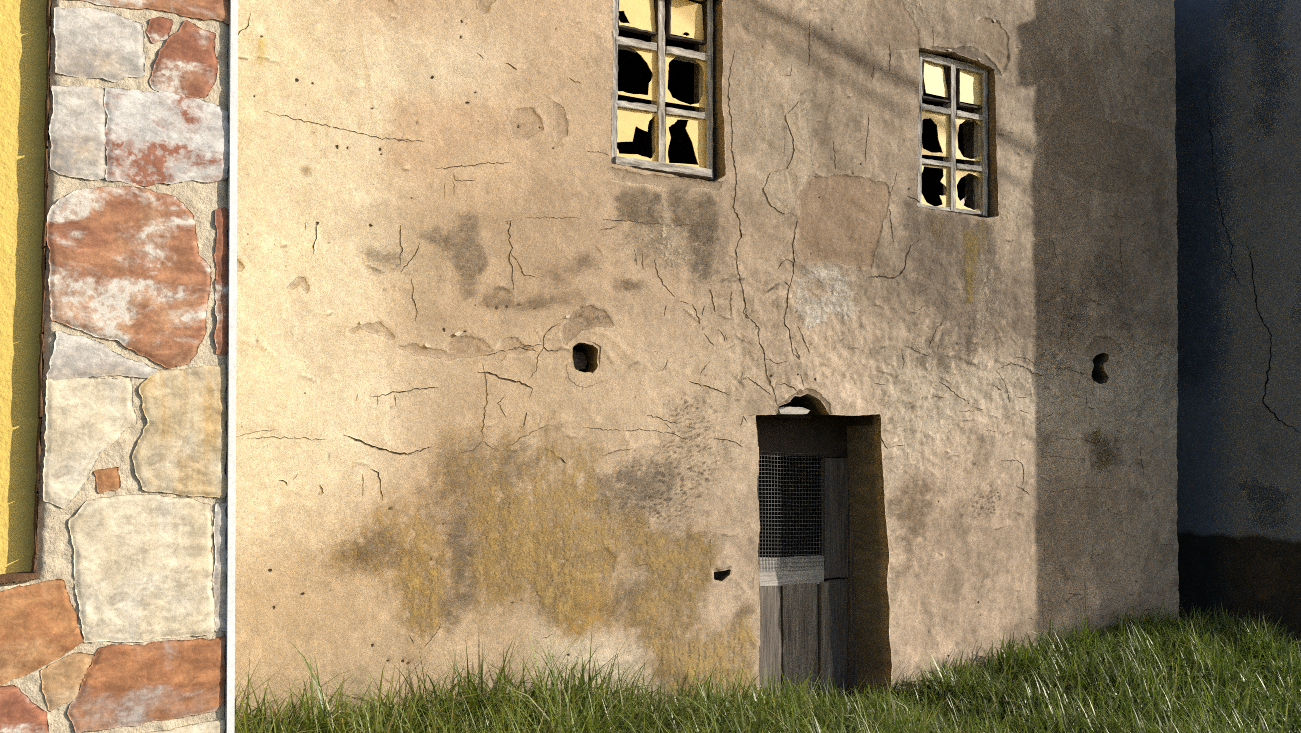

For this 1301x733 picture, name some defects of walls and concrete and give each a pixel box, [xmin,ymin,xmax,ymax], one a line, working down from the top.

crack [238,13,252,39]
crack [783,23,810,76]
crack [264,111,511,196]
leakage [421,212,566,308]
crack [506,50,810,447]
leakage [617,188,719,276]
peeling [796,174,891,270]
peeling [349,321,534,363]
crack [236,323,602,500]
crack [583,414,684,456]
leakage [598,399,725,542]
leakage [362,494,578,630]